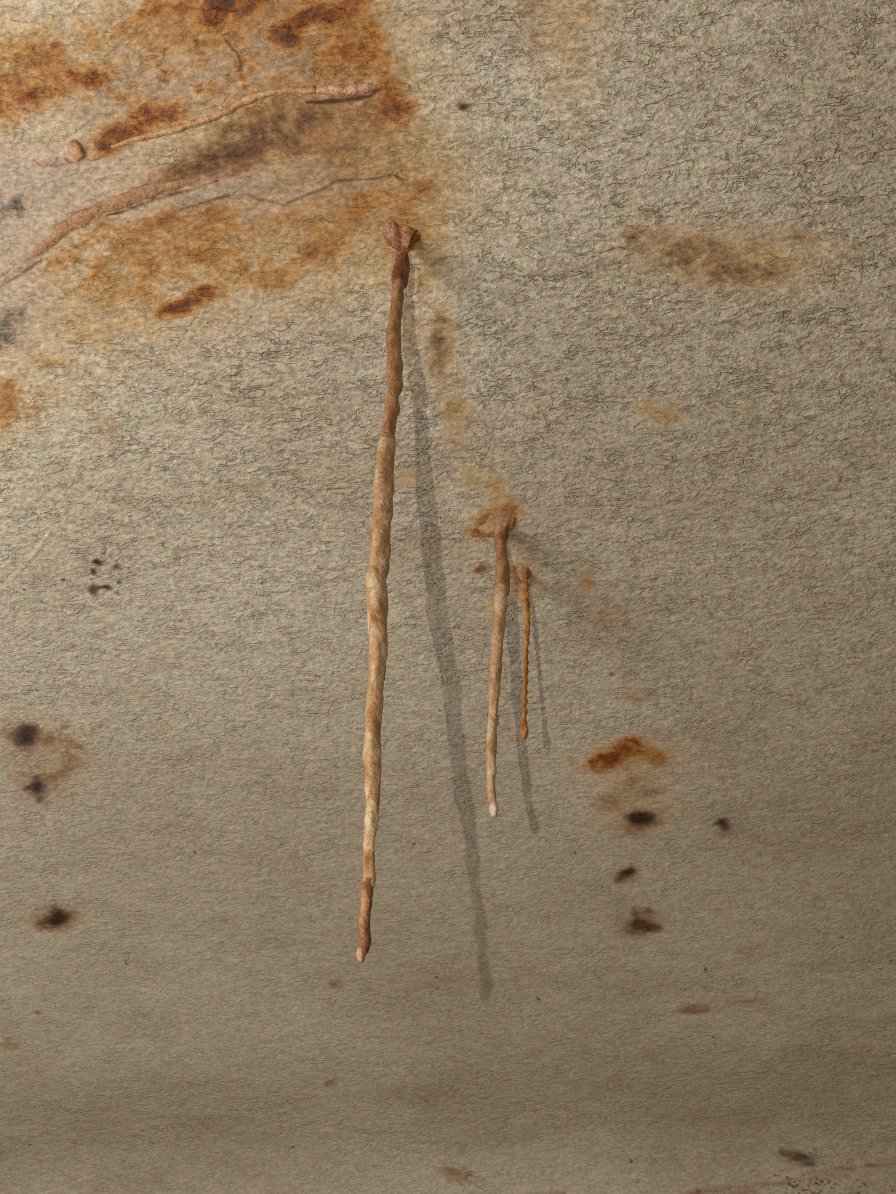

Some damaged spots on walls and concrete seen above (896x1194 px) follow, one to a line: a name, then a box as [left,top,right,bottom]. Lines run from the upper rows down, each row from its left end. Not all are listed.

corrosion [0,0,414,156]
corrosion [160,105,331,183]
corrosion [45,180,440,318]
corrosion [430,315,449,368]
corrosion [0,379,26,429]
corrosion [467,479,518,539]
water stain [4,725,83,802]
corrosion [587,737,666,834]
water stain [35,907,75,931]